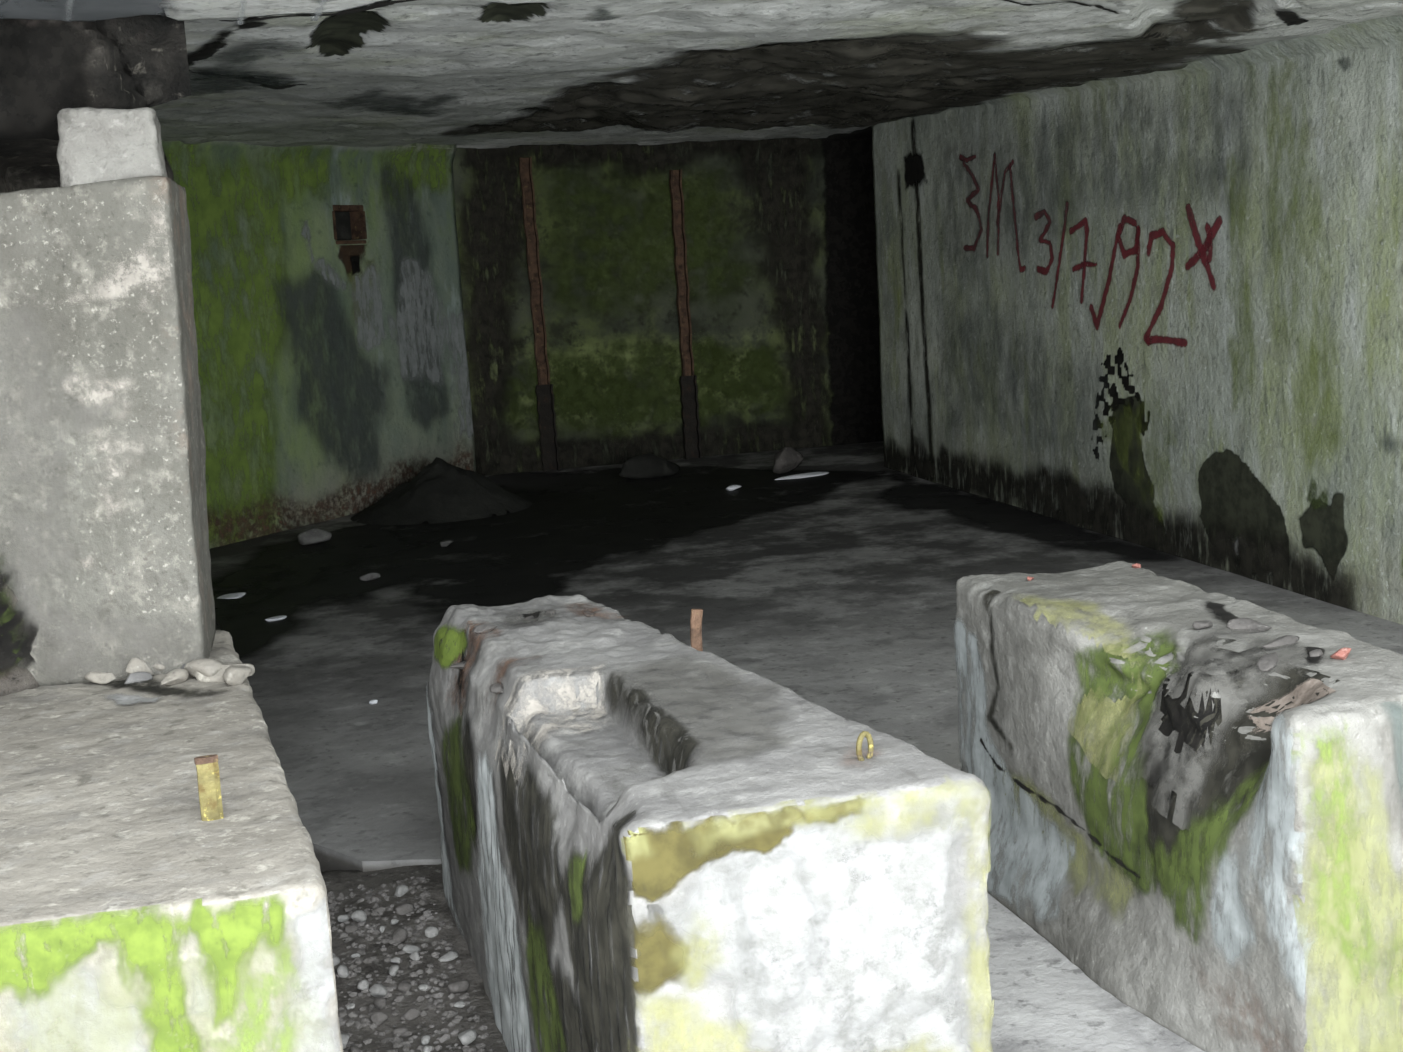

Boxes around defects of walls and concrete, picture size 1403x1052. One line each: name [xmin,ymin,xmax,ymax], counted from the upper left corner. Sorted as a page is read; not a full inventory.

crack [219,0,416,22]
crack [1003,0,1119,14]
rust [338,245,365,274]
water stain [208,119,1354,659]
crack [980,590,1140,878]
water stain [12,966,148,1052]
water stain [273,902,340,1052]